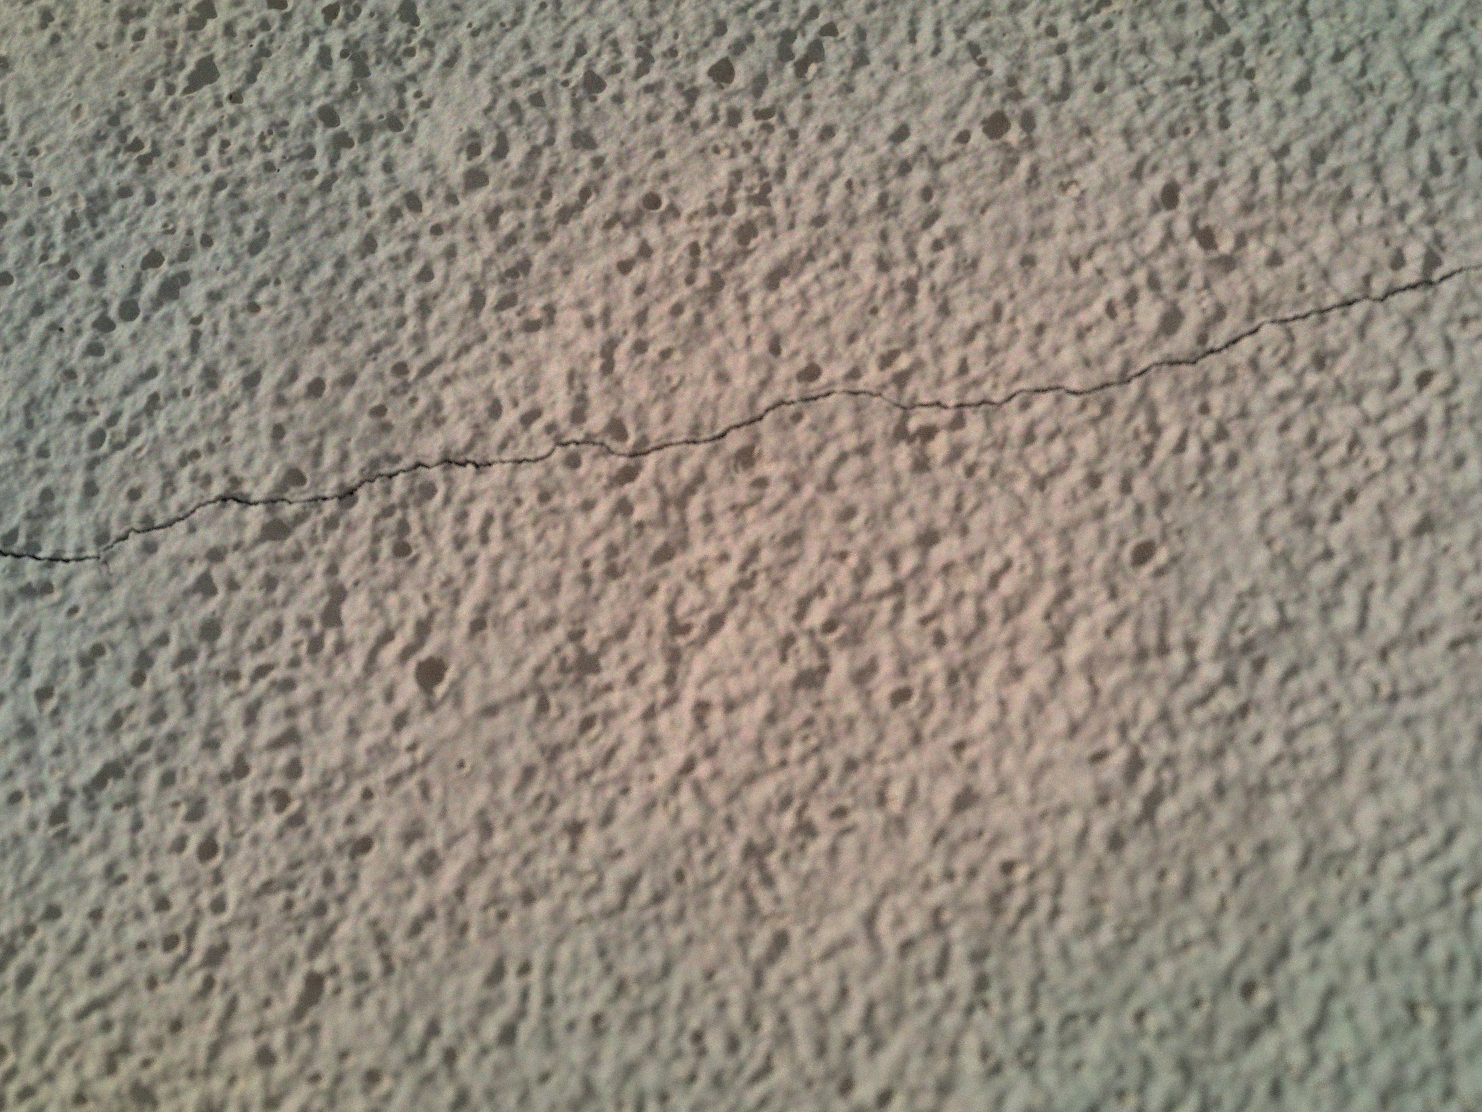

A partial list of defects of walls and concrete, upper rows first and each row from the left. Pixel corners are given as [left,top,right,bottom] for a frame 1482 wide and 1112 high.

crack [0,259,1482,578]